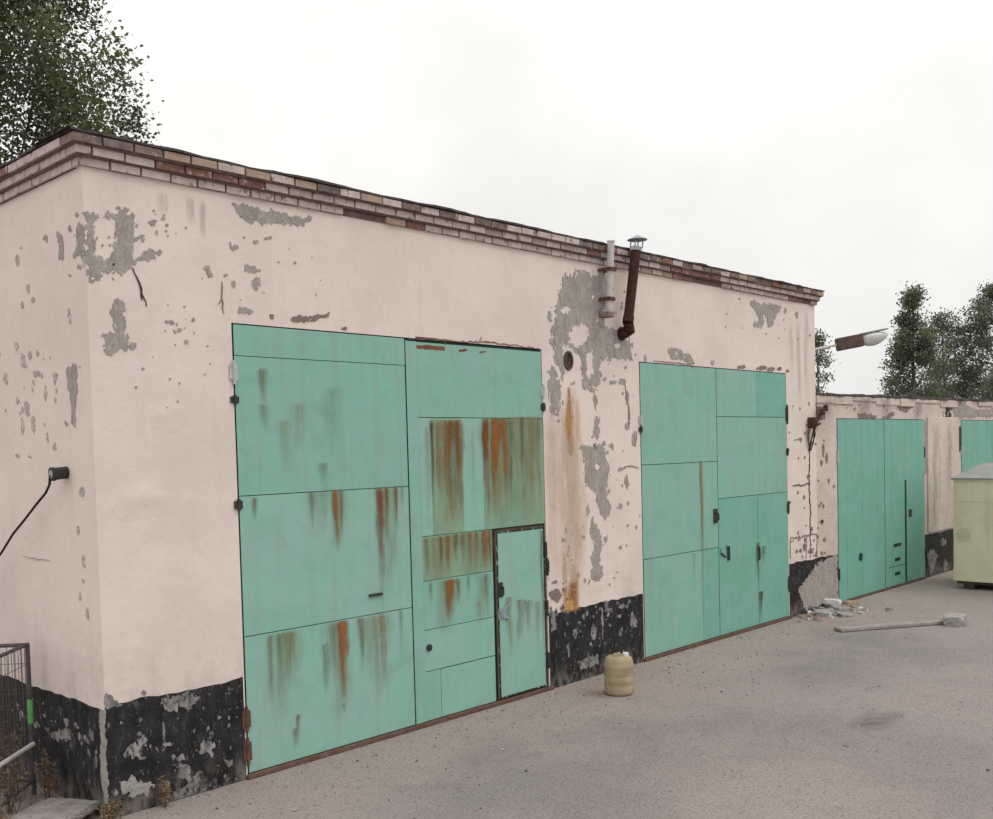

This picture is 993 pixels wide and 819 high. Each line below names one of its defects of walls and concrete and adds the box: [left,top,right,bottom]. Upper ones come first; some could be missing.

peeling [43,206,187,283]
peeling [229,202,312,251]
crack [132,269,147,307]
peeling [102,298,137,356]
corrosion [430,420,460,474]
corrosion [483,418,508,486]
peeling [547,268,647,670]
corrosion [333,490,342,532]
corrosion [376,487,398,549]
peeling [791,520,839,610]
corrosion [338,621,349,679]
peeling [33,689,211,805]